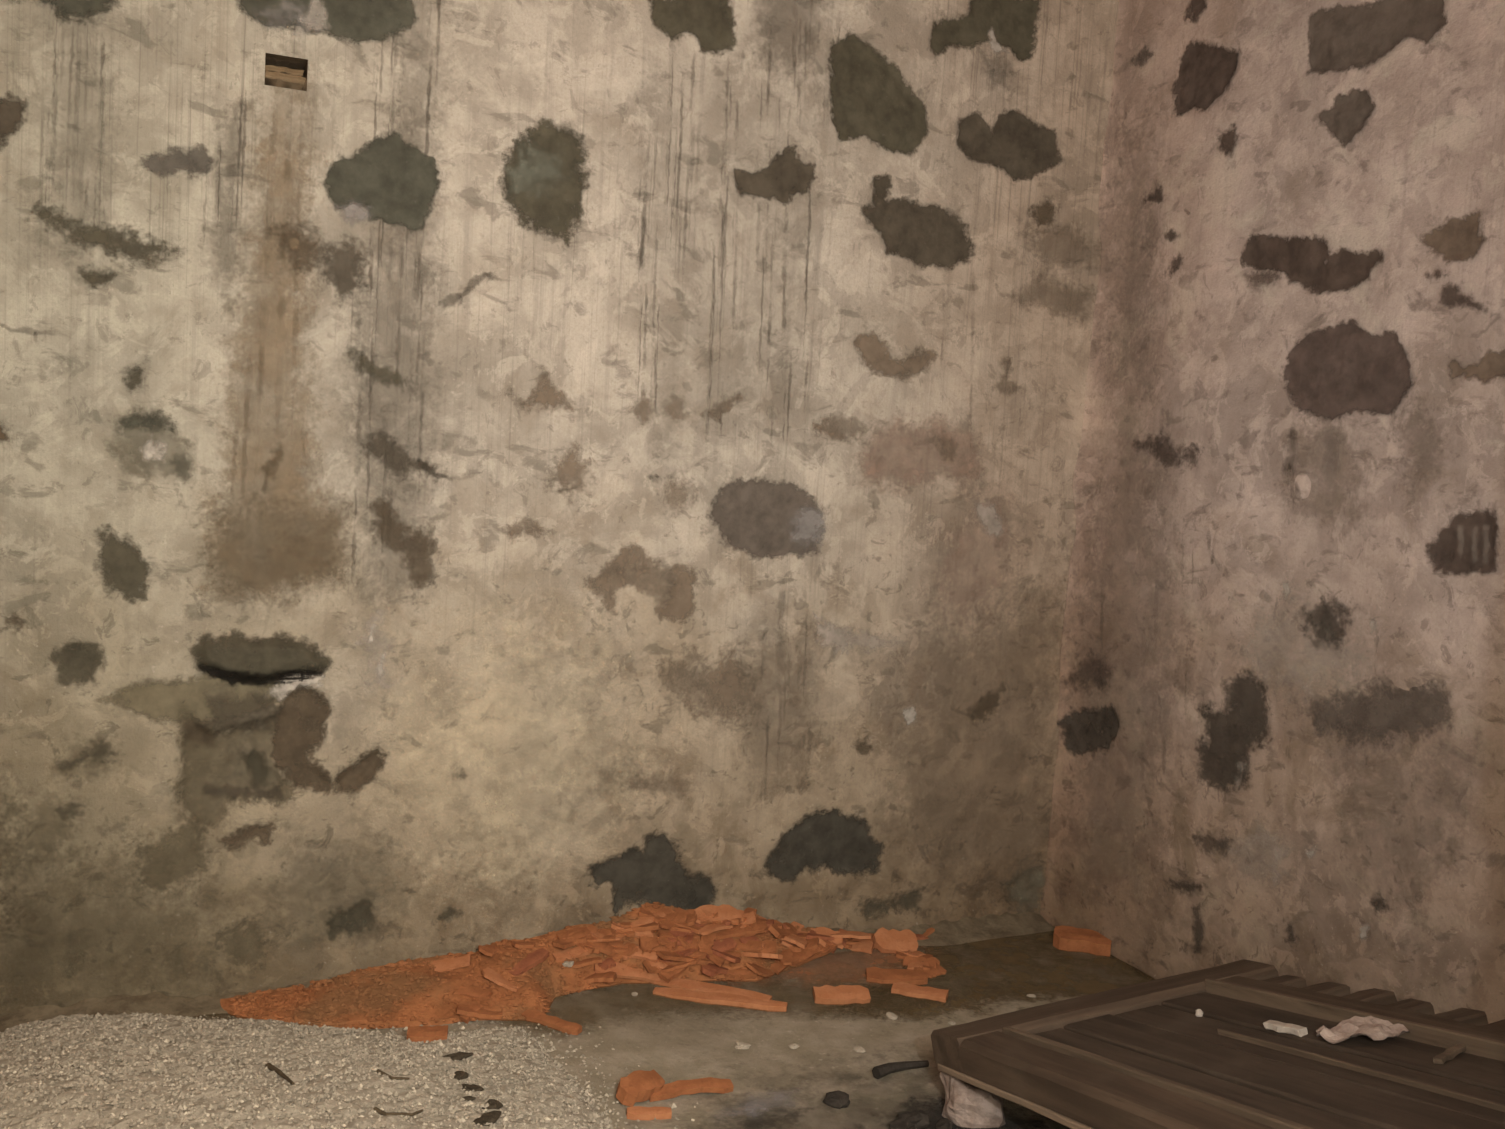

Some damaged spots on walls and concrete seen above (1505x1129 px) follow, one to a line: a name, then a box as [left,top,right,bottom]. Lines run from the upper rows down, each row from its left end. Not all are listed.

spalling [239,0,416,42]
spalling [648,0,736,54]
spalling [1307,0,1447,74]
spalling [828,34,928,155]
spalling [325,132,440,231]
spalling [500,119,589,246]
spalling [862,175,974,270]
spalling [957,110,1062,181]
spalling [1284,319,1411,420]
spalling [710,479,825,559]
spalling [98,630,387,836]
spalling [764,809,884,882]